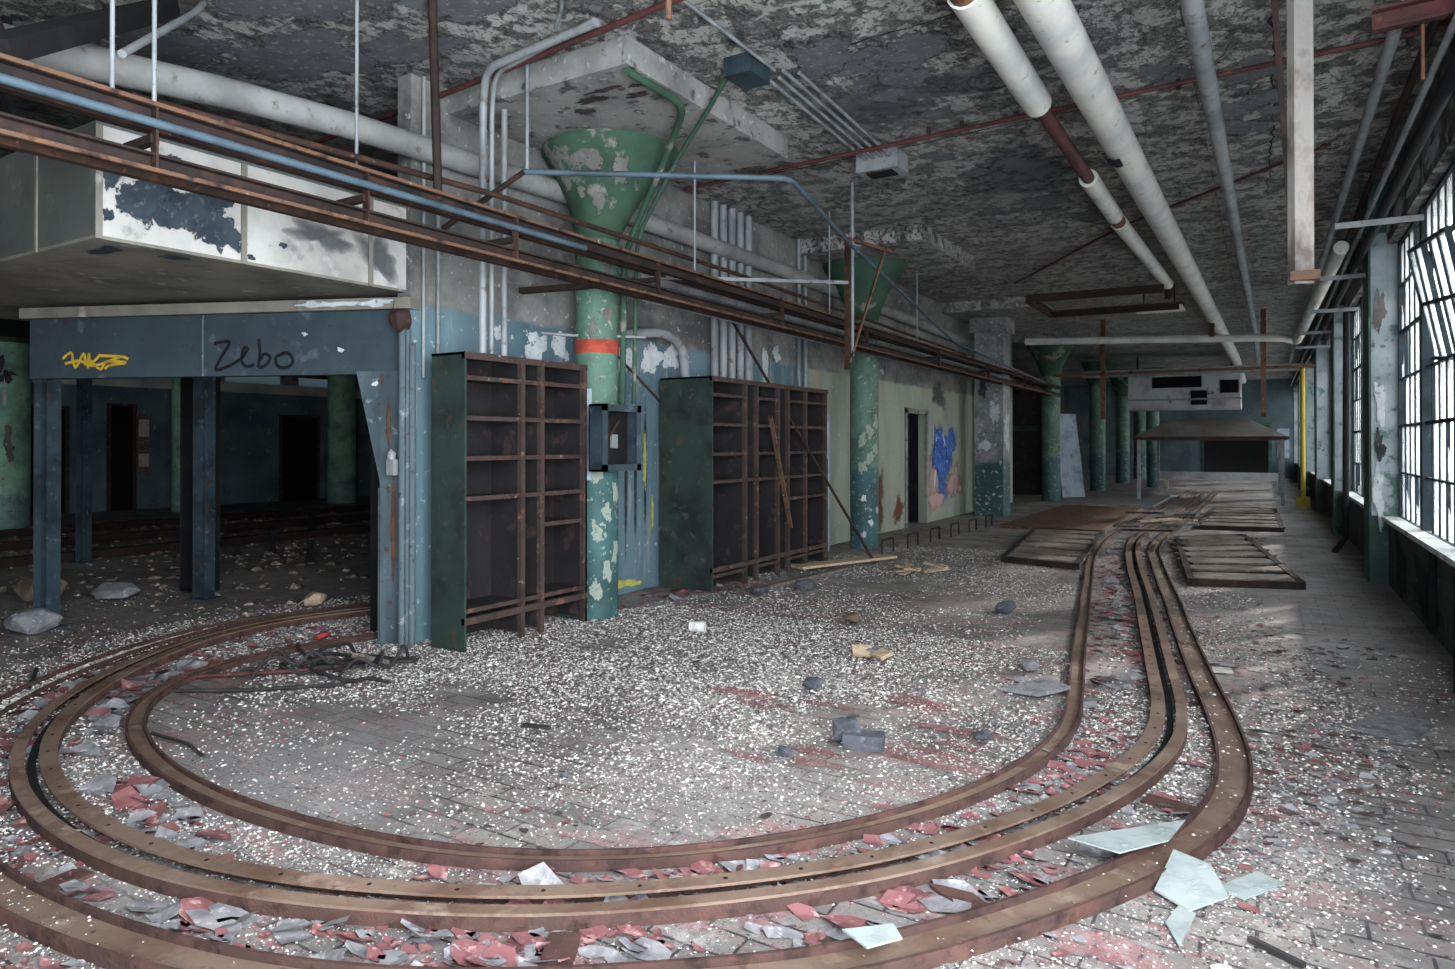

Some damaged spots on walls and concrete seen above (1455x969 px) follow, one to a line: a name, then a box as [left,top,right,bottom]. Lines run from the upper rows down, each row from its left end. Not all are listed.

peeling [549,144,629,215]
peeling [86,246,122,255]
peeling [103,172,256,260]
peeling [524,330,569,361]
peeling [618,341,679,375]
peeling [643,434,654,529]
peeling [589,472,642,601]